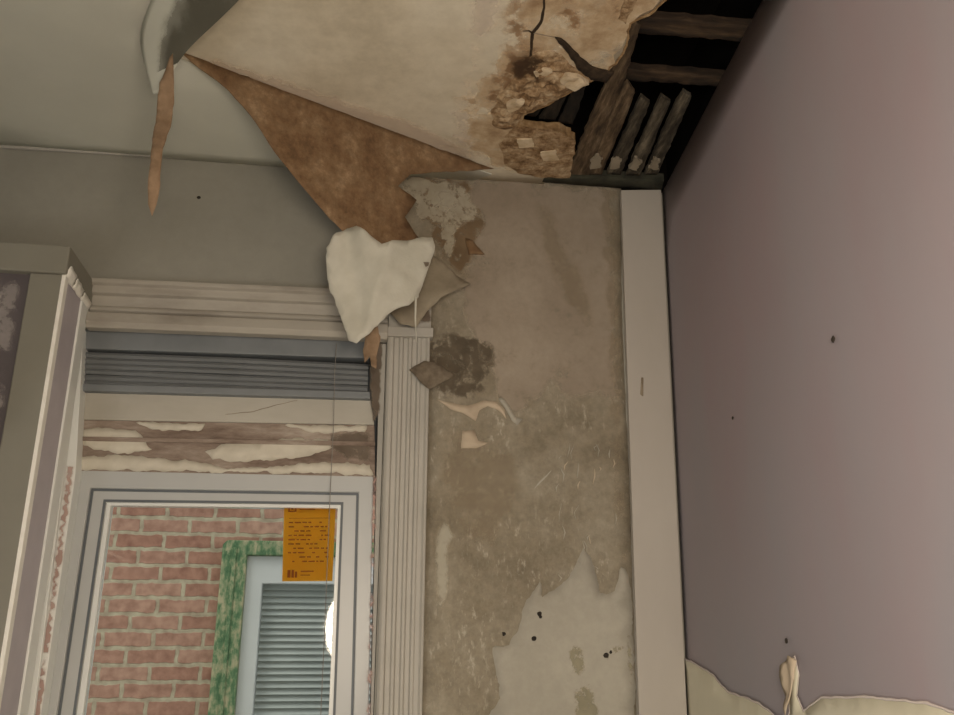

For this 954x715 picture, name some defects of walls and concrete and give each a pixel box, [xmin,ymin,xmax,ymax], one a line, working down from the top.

crack [523,0,614,83]
spalling [618,0,637,24]
water stain [217,0,660,170]
peeling [399,51,616,449]
peeling [0,284,18,351]
peeling [43,422,376,652]
peeling [490,549,636,715]
peeling [35,669,44,715]
peeling [684,656,954,715]